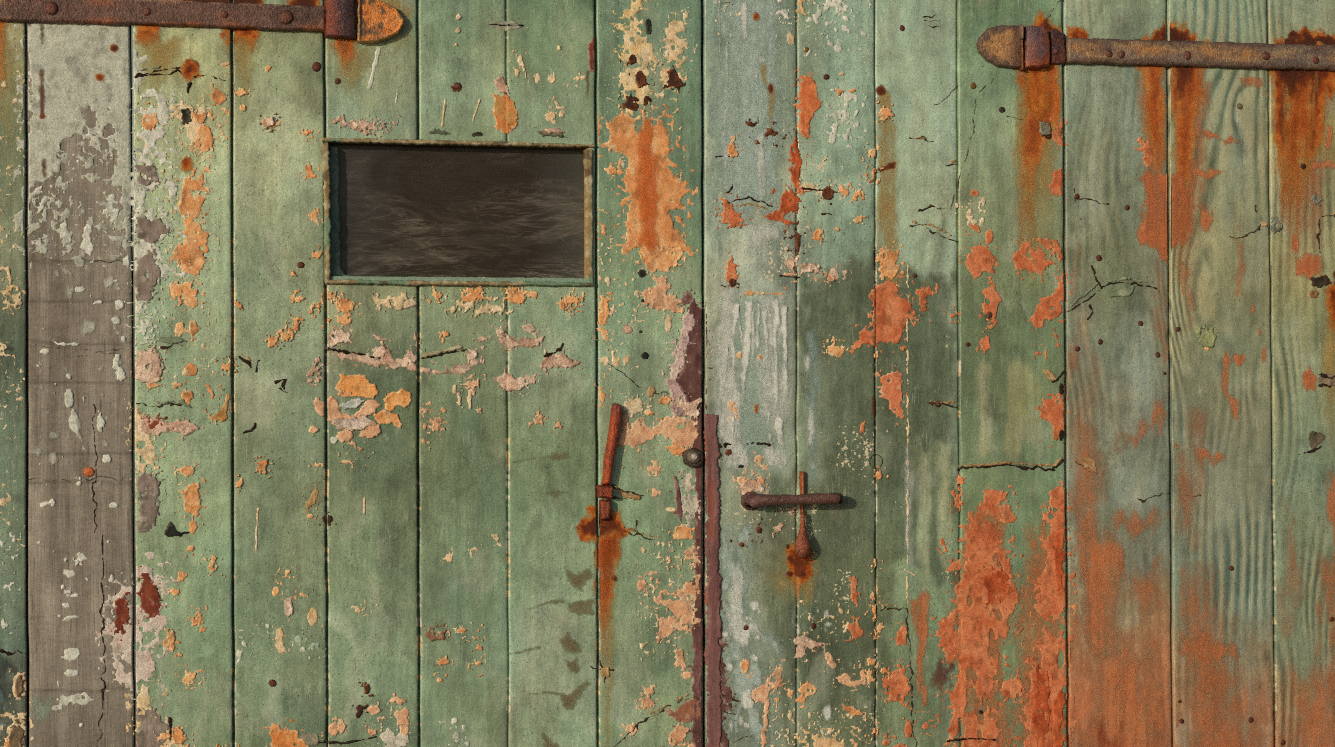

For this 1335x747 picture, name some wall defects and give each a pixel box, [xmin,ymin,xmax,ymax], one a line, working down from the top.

corrosion [1014,64,1061,237]
corrosion [1136,66,1209,219]
peeling [1131,136,1219,278]
corrosion [1269,69,1335,229]
crack [36,344,125,357]
peeling [0,23,250,747]
peeling [263,0,1170,747]
crack [1067,265,1159,320]
crack [29,404,125,741]
peeling [236,567,334,665]
corrosion [576,505,630,732]
corrosion [779,544,814,603]